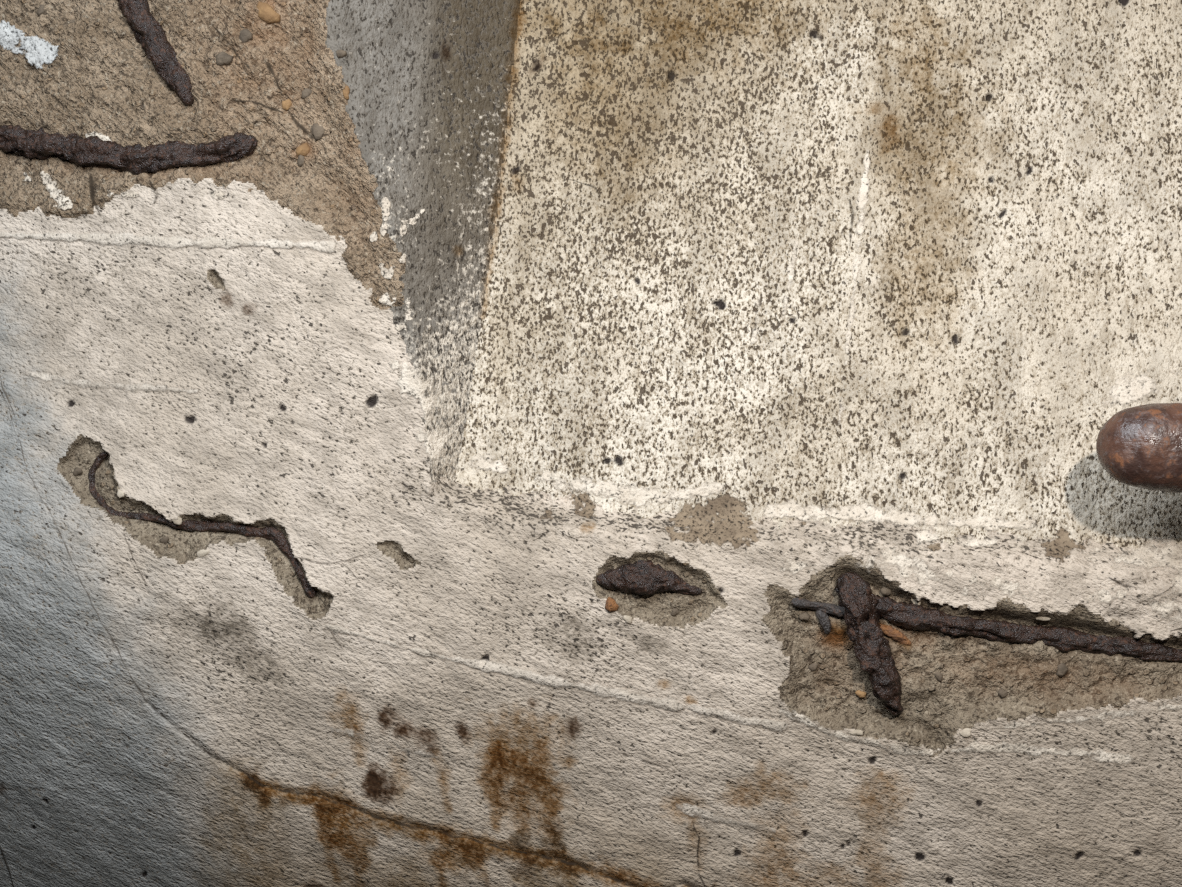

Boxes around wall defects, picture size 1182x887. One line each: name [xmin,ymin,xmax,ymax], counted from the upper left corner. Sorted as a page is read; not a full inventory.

spalling [0,0,425,331]
spalling [57,434,334,620]
corrosion [363,770,395,798]
crack [134,682,637,886]
corrosion [379,712,430,741]
crack [680,824,705,887]
spalling [535,471,1182,764]
corrosion [880,624,911,646]